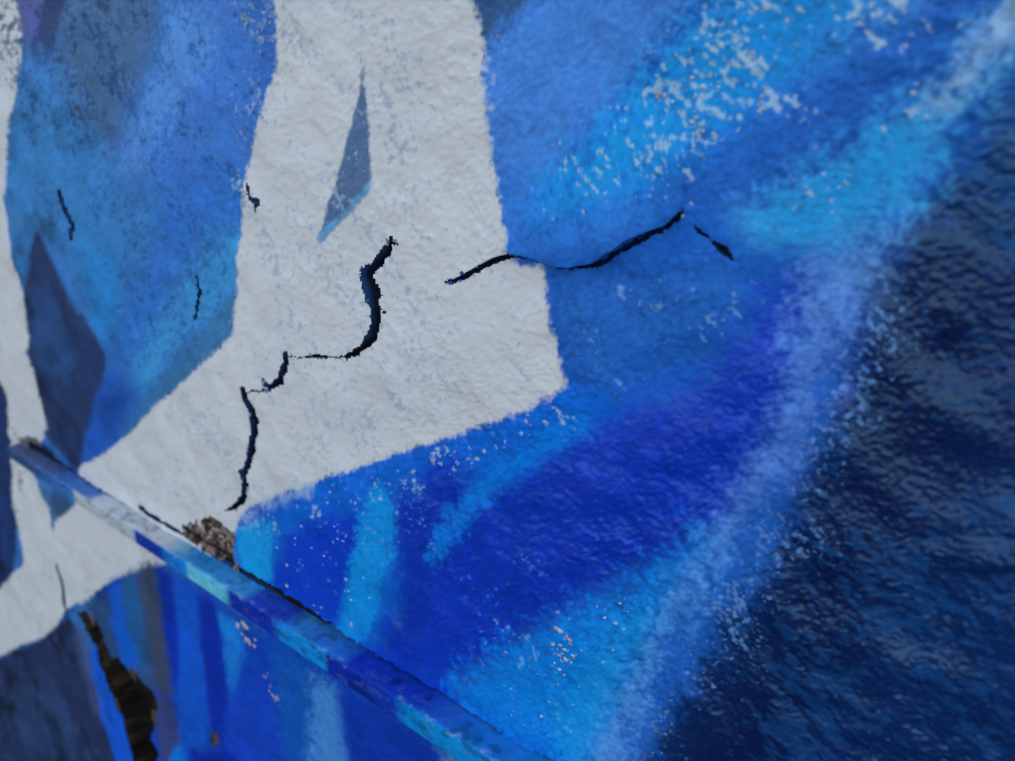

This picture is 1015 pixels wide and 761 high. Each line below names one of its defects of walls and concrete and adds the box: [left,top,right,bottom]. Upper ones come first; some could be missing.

crack [445,208,734,285]
crack [228,236,398,511]
spalling [182,516,239,573]
spalling [73,609,159,761]